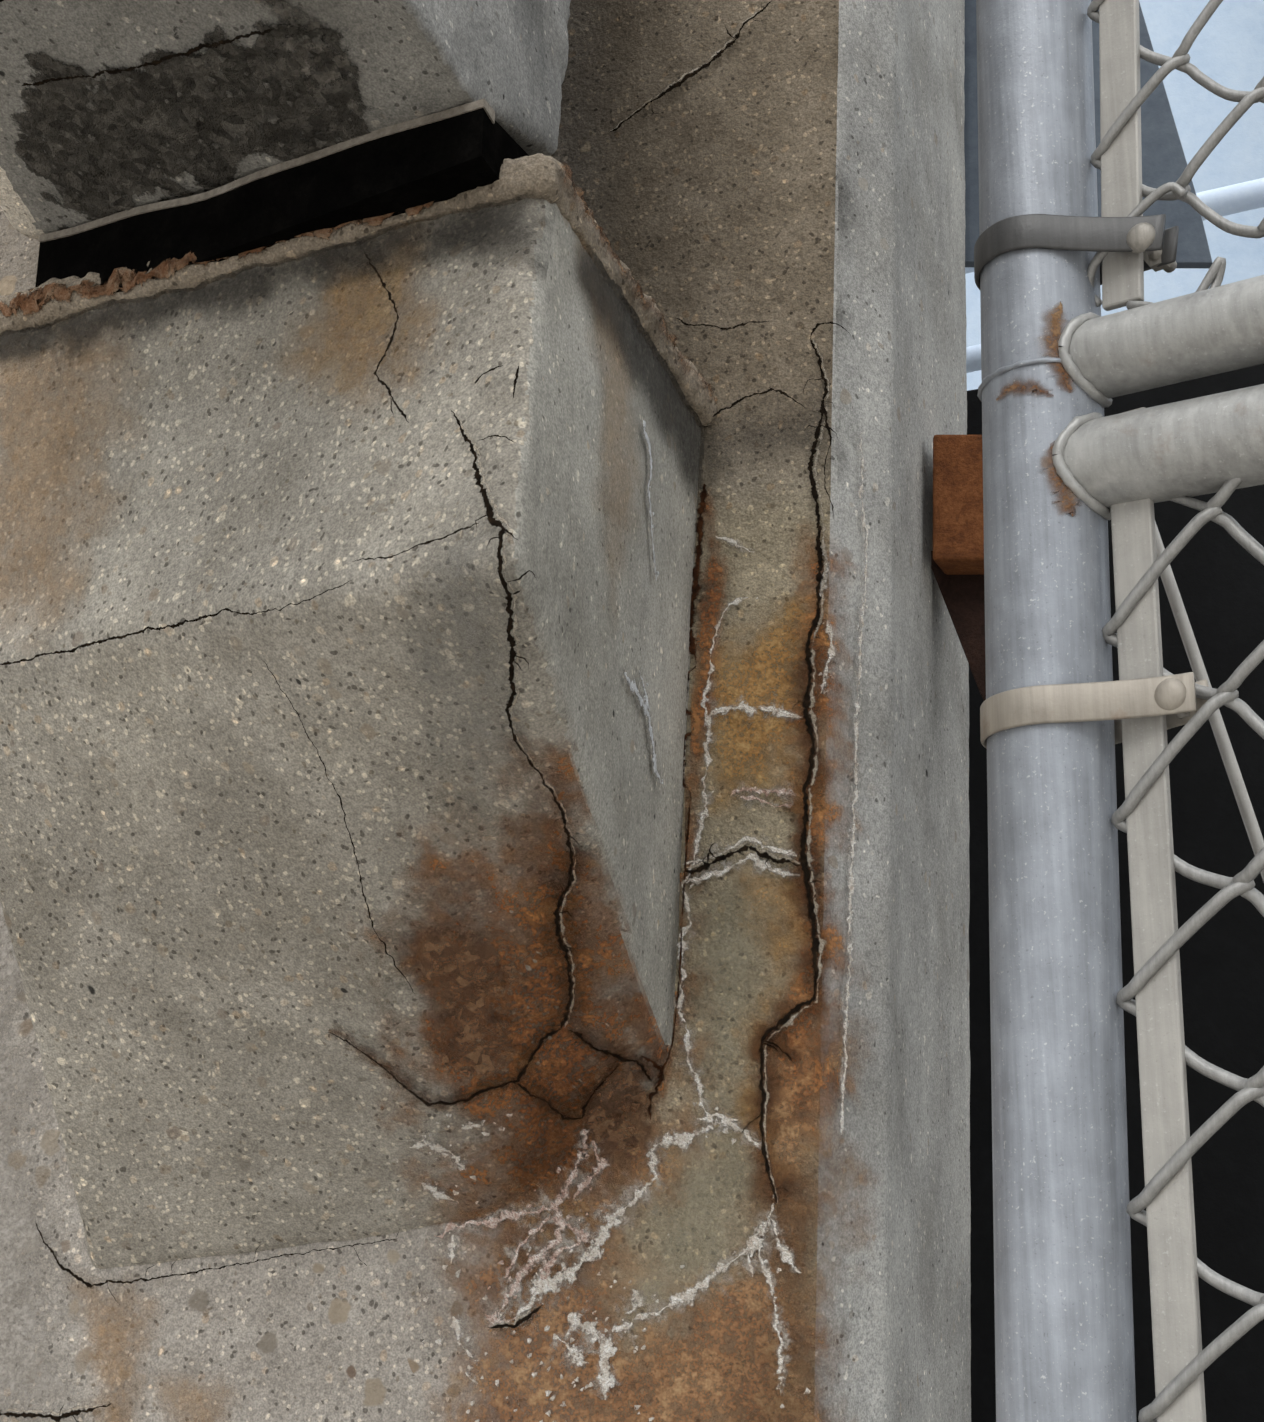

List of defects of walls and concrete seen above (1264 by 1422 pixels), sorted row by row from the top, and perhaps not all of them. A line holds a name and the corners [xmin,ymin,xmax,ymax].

spalling [11,0,374,231]
crack [610,0,772,132]
spalling [0,201,434,317]
crack [363,250,408,422]
crack [0,322,849,1203]
leakage [0,921,20,998]
leakage [421,597,802,1422]
corrosion [410,538,848,1422]
leakage [0,1062,61,1396]
crack [35,1219,400,1301]
leakage [396,1114,513,1202]
crack [0,1401,112,1422]